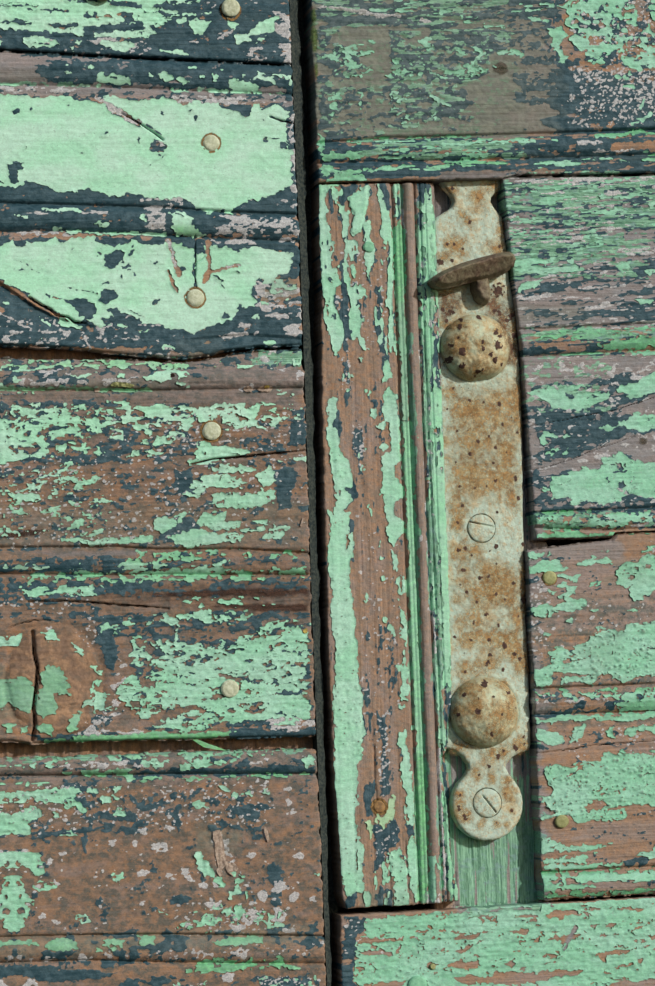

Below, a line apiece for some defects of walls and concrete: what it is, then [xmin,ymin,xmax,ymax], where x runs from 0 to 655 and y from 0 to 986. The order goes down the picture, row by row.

peeling [0,0,212,52]
peeling [511,0,655,89]
peeling [0,49,297,335]
corrosion [437,235,465,265]
corrosion [458,181,498,225]
corrosion [439,282,518,379]
peeling [0,344,307,598]
crack [200,451,293,463]
peeling [316,134,655,986]
corrosion [443,378,529,827]
peeling [0,596,315,836]
peeling [0,851,78,952]